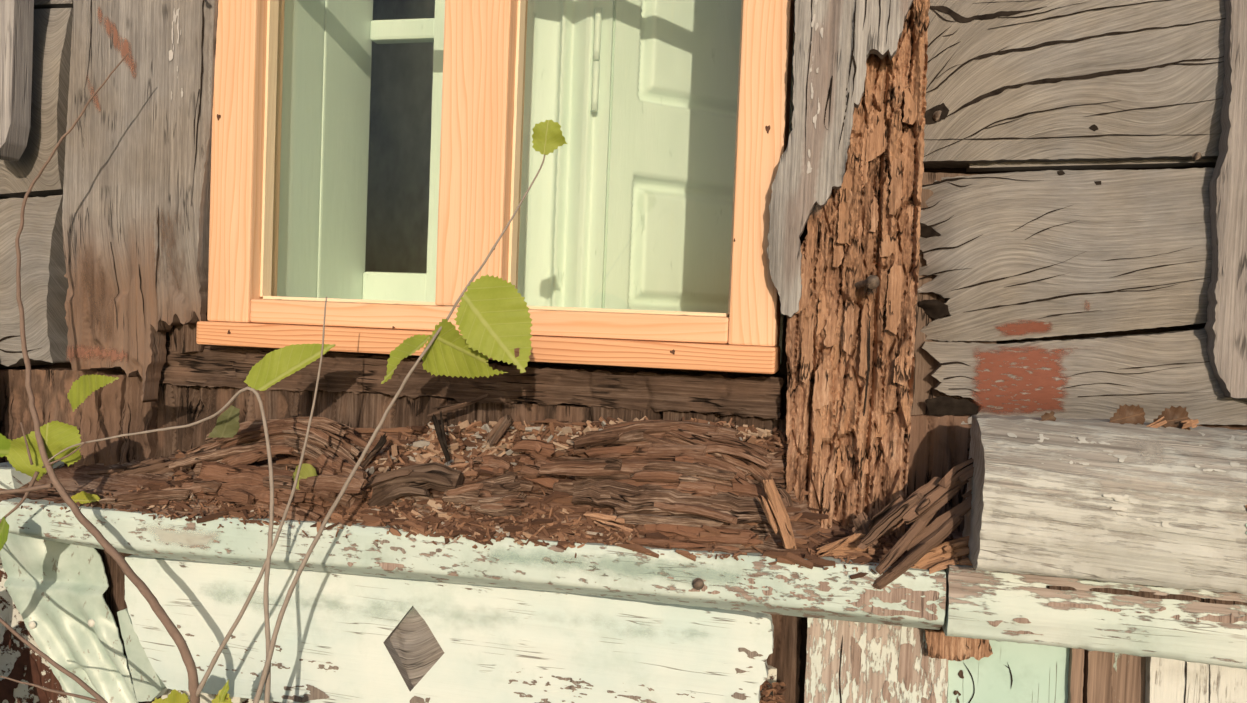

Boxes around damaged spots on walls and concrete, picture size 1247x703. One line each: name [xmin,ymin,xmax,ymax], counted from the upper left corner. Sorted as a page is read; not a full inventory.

crack [919,0,1226,319]
spalling [786,0,930,530]
crack [937,361,980,394]
crack [1063,361,1210,397]
peeling [1007,433,1049,464]
peeling [1059,436,1127,465]
peeling [328,535,415,572]
peeling [735,574,832,606]
peeling [845,584,939,621]
peeling [0,630,49,703]
peeling [851,636,862,685]
peeling [876,643,937,703]